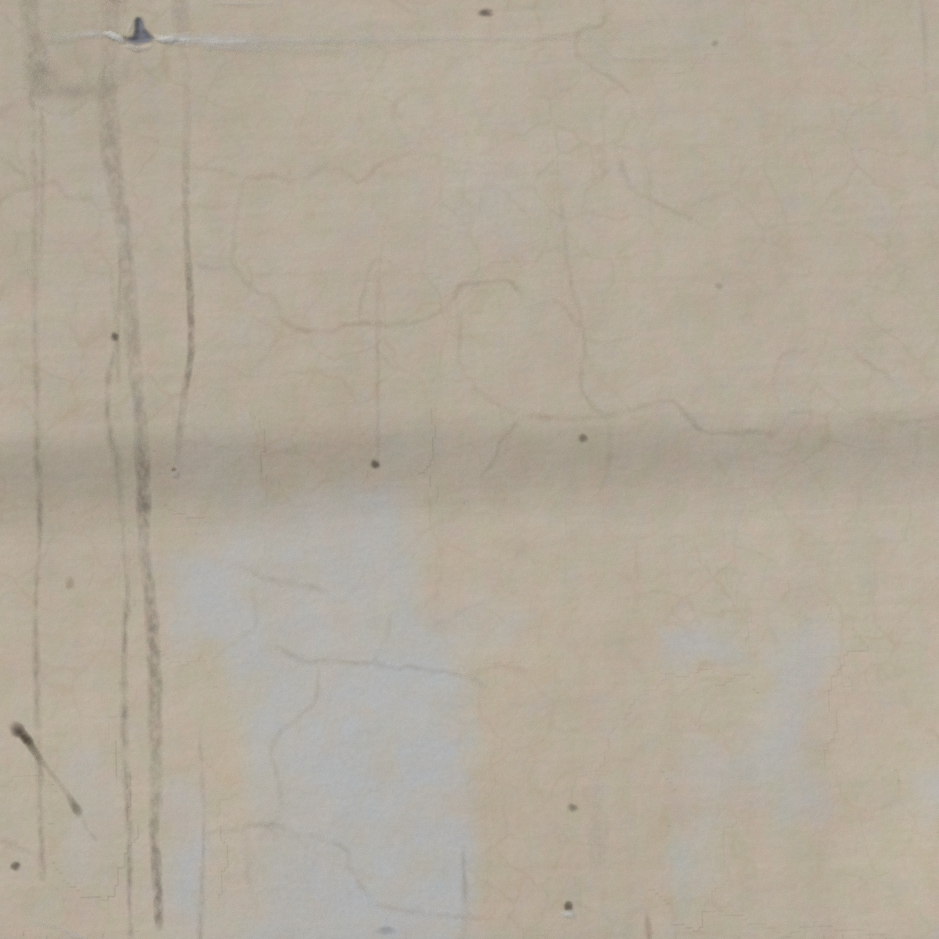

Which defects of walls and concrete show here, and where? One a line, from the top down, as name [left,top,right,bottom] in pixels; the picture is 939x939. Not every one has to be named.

crack [15,728,32,745]
water stain [0,507,138,786]